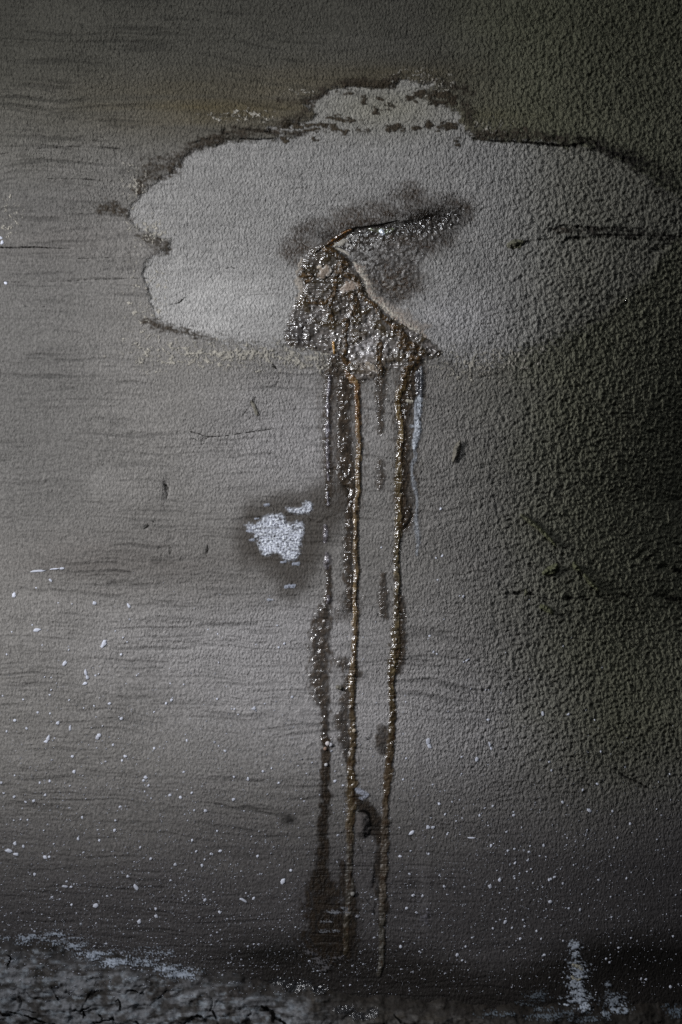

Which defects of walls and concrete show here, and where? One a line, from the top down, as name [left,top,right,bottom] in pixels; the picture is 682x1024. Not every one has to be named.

crack [340,220,400,234]
peeling [97,69,682,395]
efflorescence [246,502,312,565]
rust [301,350,420,976]